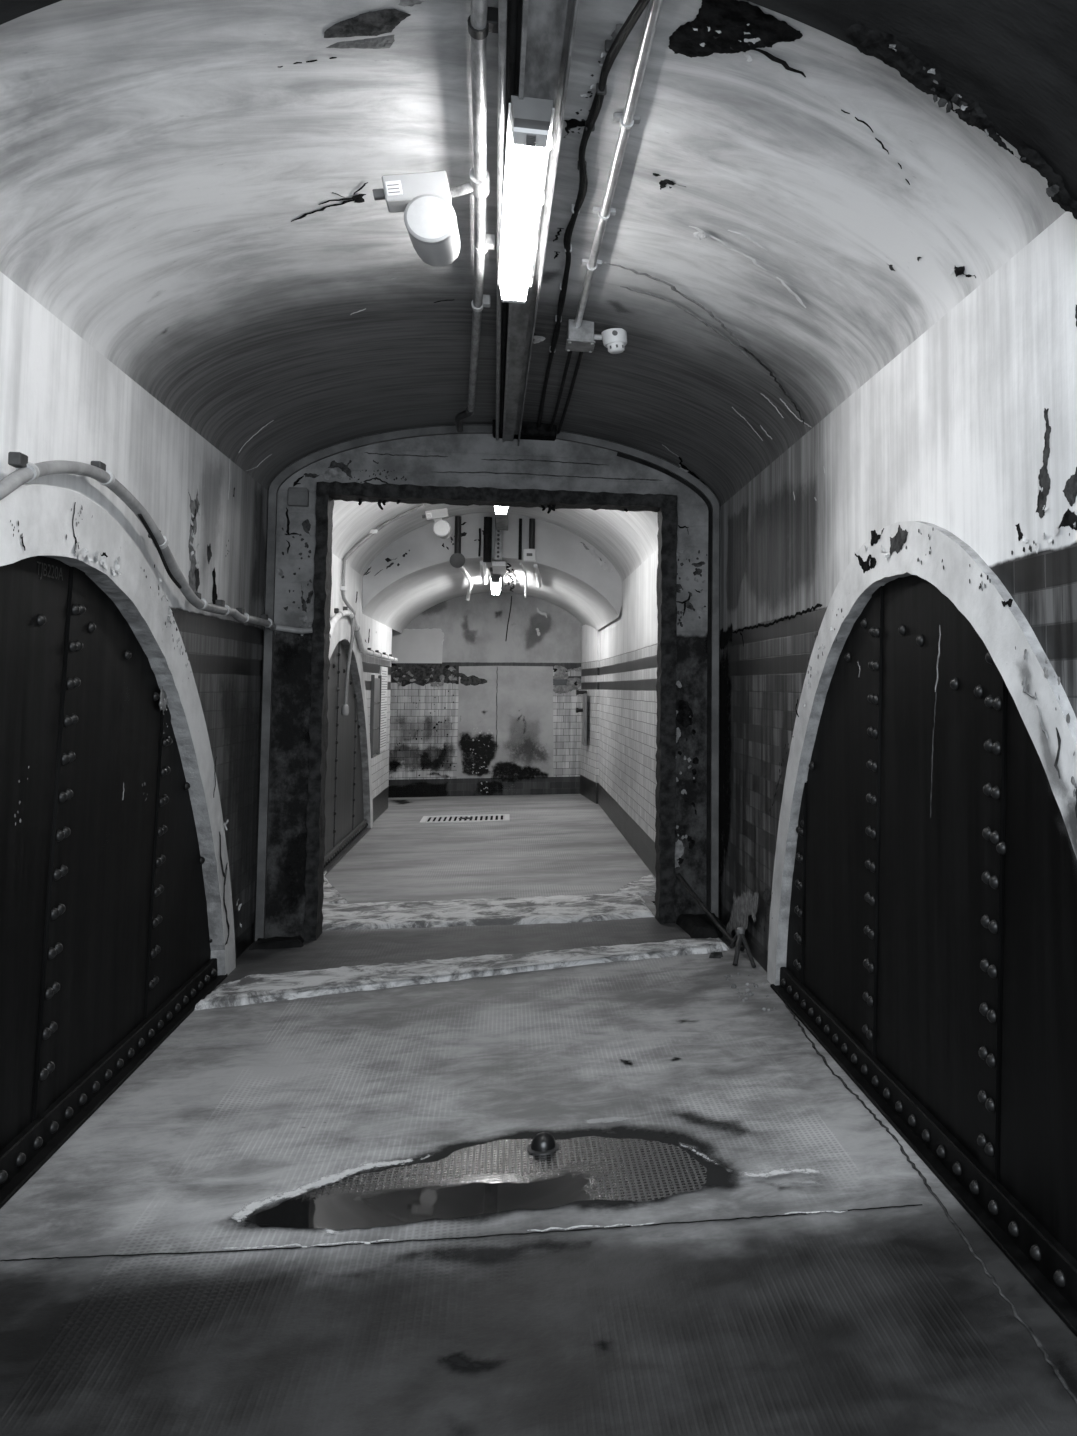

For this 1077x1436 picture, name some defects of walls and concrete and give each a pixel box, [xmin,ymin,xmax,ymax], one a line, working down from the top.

peeling [324,0,425,49]
flaking render [668,0,806,77]
flaking render [841,21,1077,220]
crack [291,182,368,222]
peeling [653,173,686,190]
peeling [947,266,976,279]
peeling [1011,408,1077,555]
peeling [188,490,229,604]
peeling [855,525,944,573]
water stain [388,689,548,804]
peeling [1015,646,1077,818]
crack [0,1003,1077,1404]